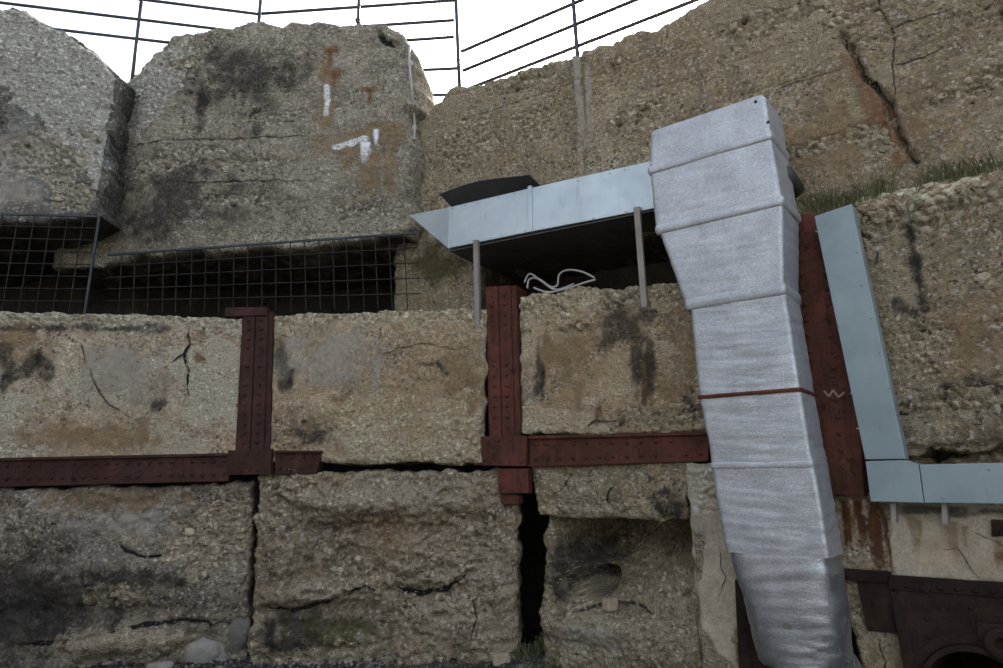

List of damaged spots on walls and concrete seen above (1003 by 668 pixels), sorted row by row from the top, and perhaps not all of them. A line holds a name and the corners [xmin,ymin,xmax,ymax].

rust [325,46,340,86]
crack [779,0,956,164]
rust [850,55,909,164]
damp [0,342,54,393]
damp [0,323,168,332]
crack [80,342,129,417]
crack [170,333,191,396]
damp [600,295,657,389]
rust [840,499,891,562]